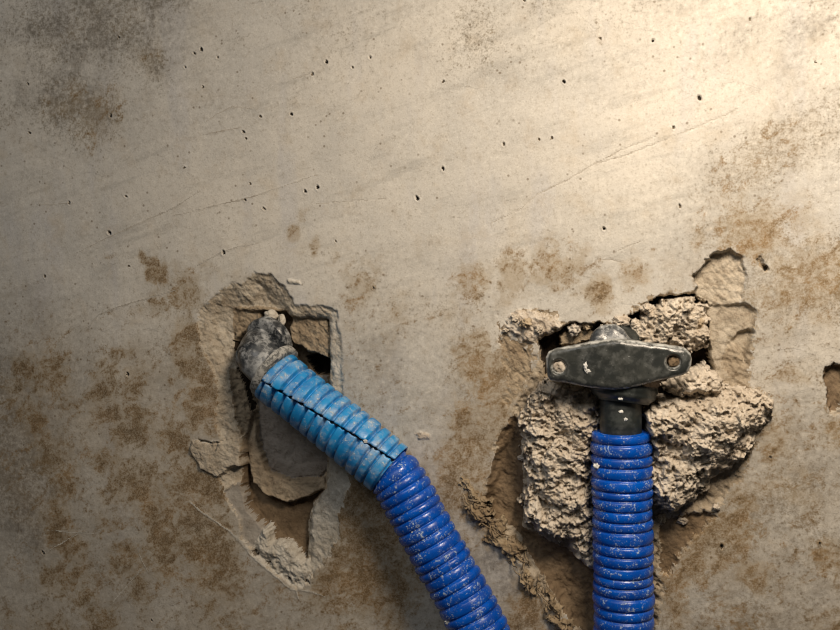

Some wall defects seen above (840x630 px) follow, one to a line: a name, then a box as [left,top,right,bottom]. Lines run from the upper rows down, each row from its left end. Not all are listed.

crack [492,108,738,223]
damp [0,321,93,589]
spalling [190,273,351,590]
spalling [464,308,612,630]
spalling [623,249,762,392]
spalling [651,422,770,630]
spalling [823,362,840,417]